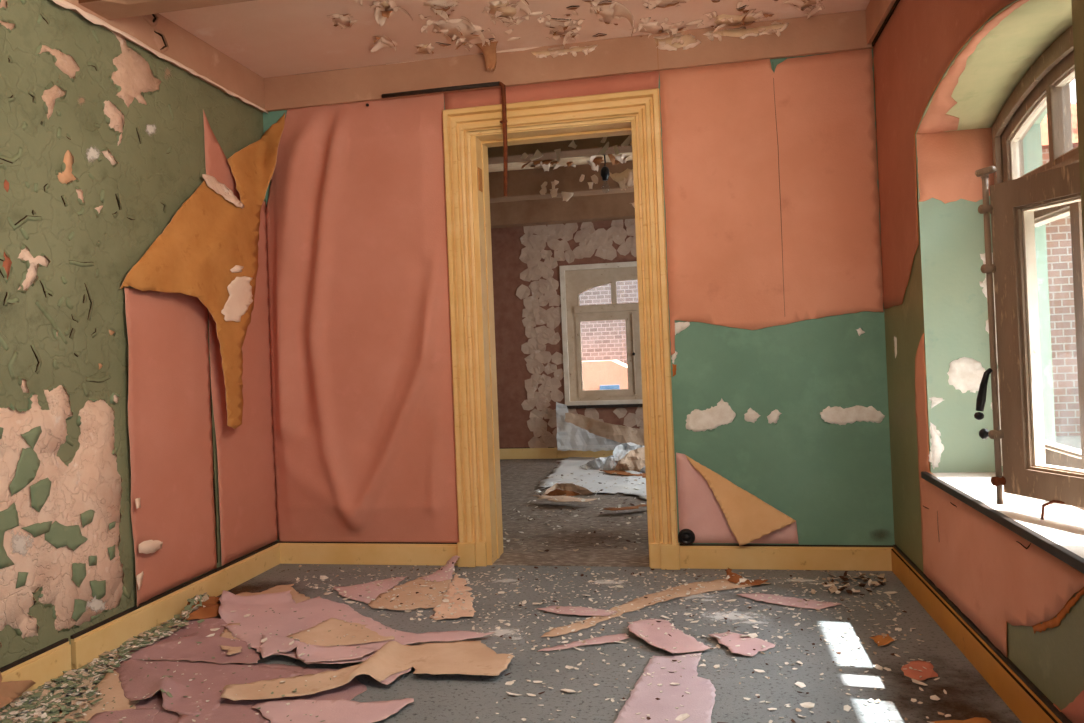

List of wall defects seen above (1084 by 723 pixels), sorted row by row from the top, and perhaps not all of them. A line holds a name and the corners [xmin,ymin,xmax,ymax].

peeling [354,0,789,71]
peeling [35,42,80,119]
peeling [100,32,161,168]
peeling [55,150,103,217]
peeling [521,135,634,202]
peeling [2,244,51,293]
peeling [516,203,637,448]
spalling [675,322,690,335]
spalling [686,398,782,432]
spalling [818,405,885,425]
peeling [0,376,143,649]
peeling [138,540,163,554]